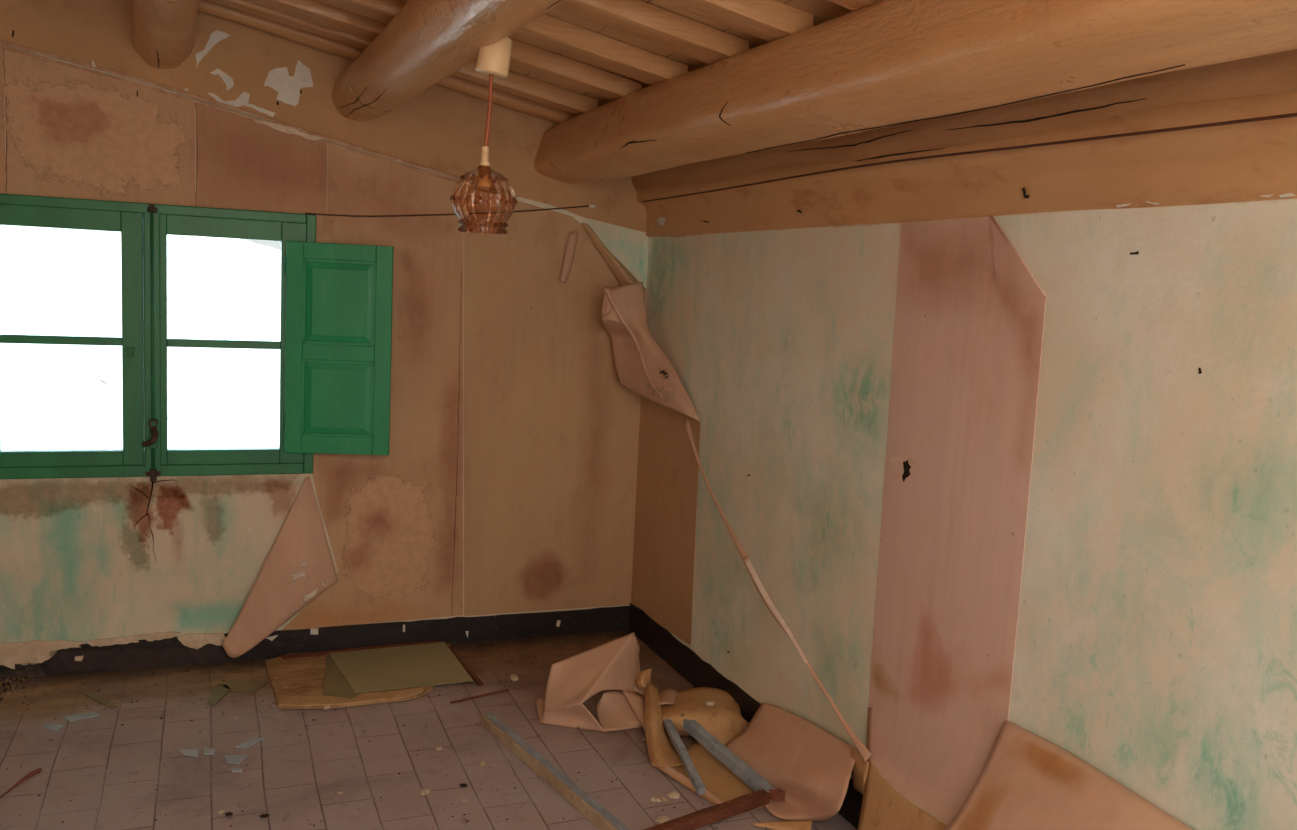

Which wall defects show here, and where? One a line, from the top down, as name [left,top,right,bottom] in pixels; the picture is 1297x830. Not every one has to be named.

damp [1,77,192,196]
peeling [196,30,325,140]
crack [747,64,1185,161]
spalling [890,454,916,482]
damp [340,474,436,600]
peeling [683,417,872,794]